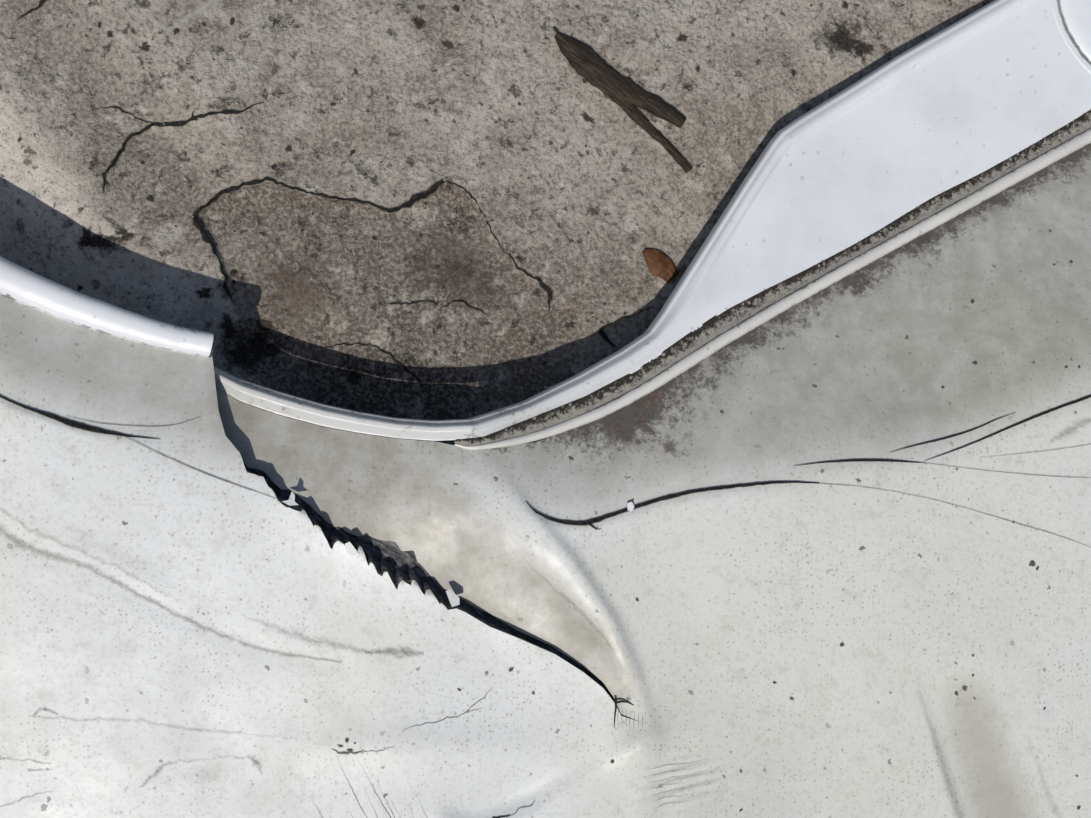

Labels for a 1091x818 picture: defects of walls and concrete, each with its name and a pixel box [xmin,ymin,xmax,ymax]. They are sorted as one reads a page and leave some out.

crack [92,101,264,193]
crack [192,177,553,312]
crack [0,395,276,499]
crack [525,395,1091,547]